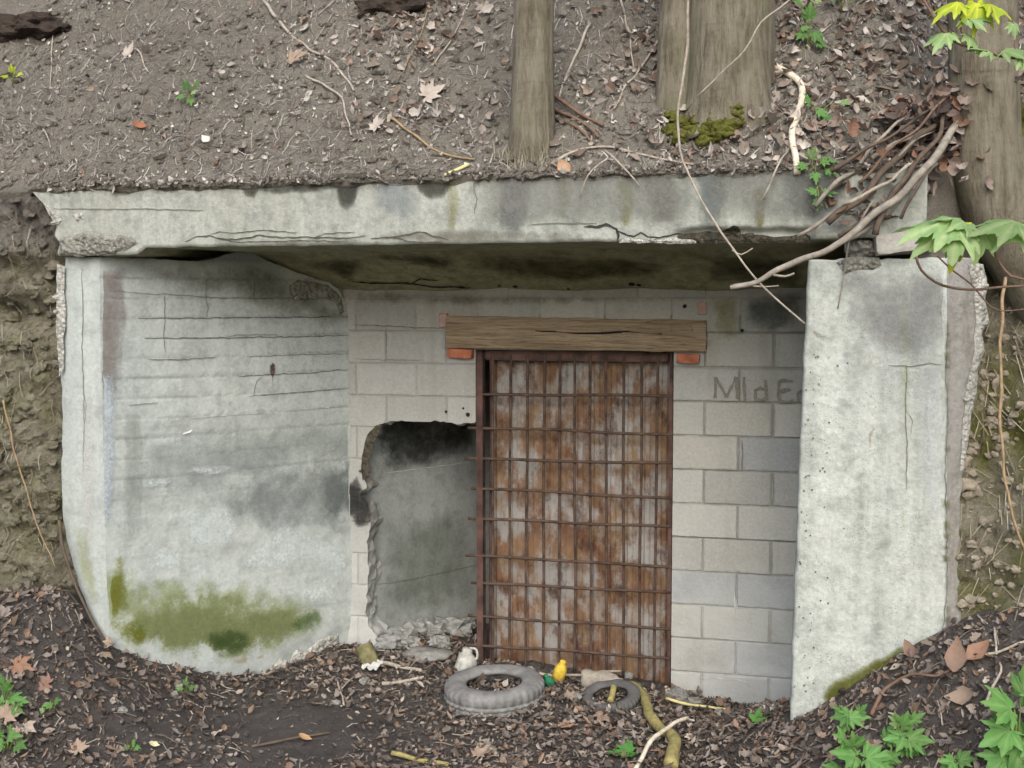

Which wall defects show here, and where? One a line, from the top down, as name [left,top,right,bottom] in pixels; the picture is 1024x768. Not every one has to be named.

spalling [43,201,137,376]
crack [54,208,447,243]
crack [111,280,435,419]
crack [531,222,682,241]
spalling [960,264,989,471]
spalling [359,425,381,480]
crack [890,324,949,629]